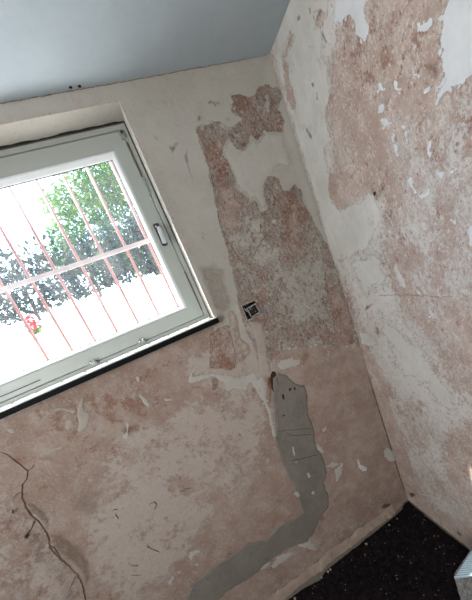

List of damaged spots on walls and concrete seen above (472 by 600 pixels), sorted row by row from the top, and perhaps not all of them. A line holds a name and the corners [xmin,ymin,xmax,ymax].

peeling [417,15,445,32]
flaking render [196,0,383,370]
peeling [378,102,408,144]
crack [1,452,86,600]